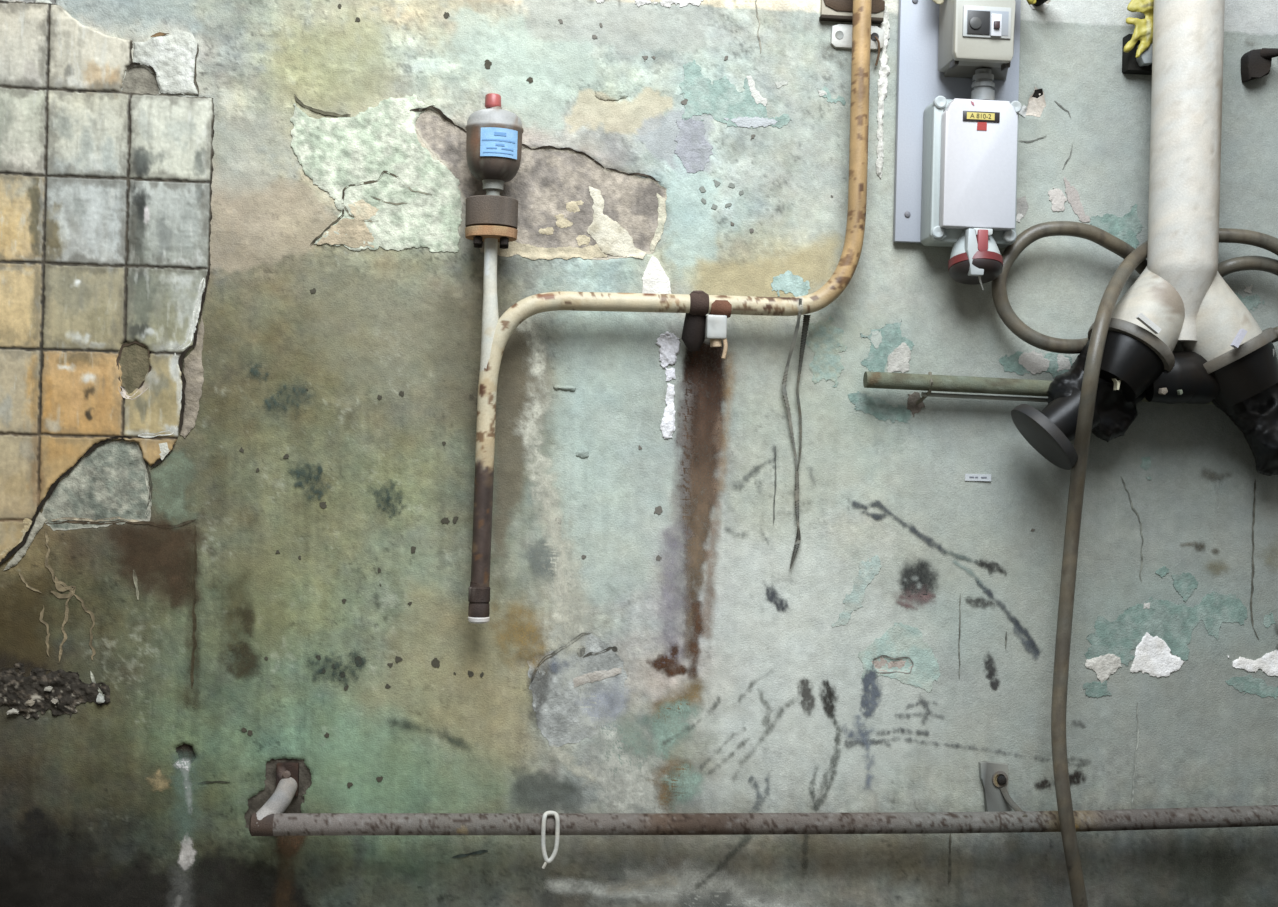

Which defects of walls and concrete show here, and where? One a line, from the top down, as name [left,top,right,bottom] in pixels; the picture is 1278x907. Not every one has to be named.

flaking render [122,32,199,95]
crack [410,105,455,126]
flaking render [290,94,671,294]
flaking render [41,269,210,531]
rust [652,342,731,716]
crack [1121,477,1144,582]
crack [1250,480,1259,639]
peeling [1083,566,1248,698]
peeling [1225,650,1278,699]
damp [0,759,311,907]
rust [652,761,688,805]
damp [546,862,796,907]